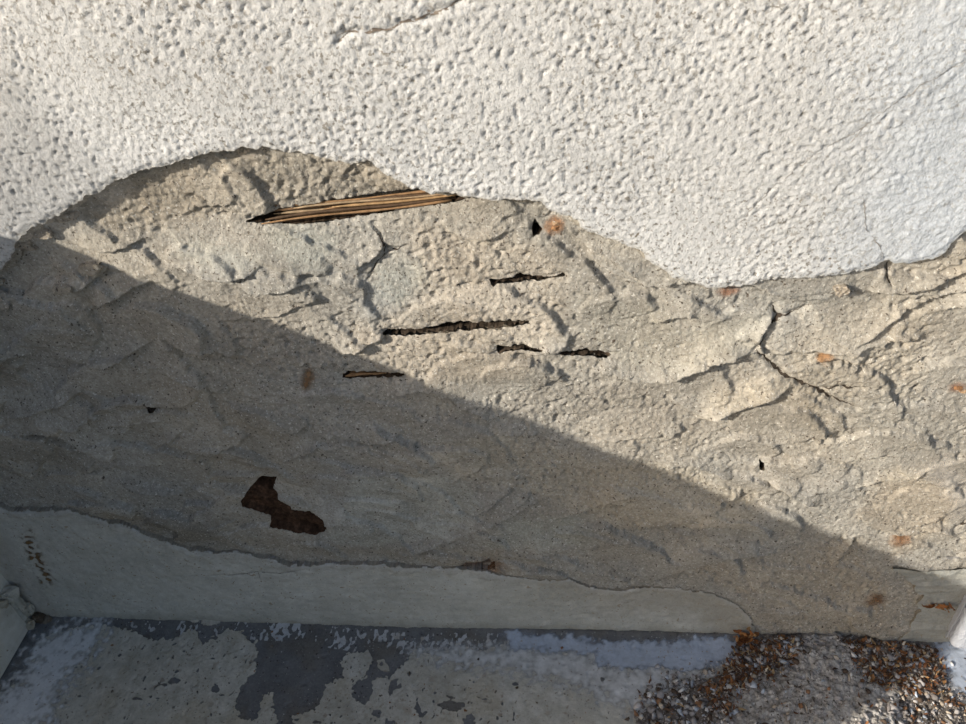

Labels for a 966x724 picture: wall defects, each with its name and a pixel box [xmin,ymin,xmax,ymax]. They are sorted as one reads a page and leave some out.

flaking render [0,146,966,724]
crack [756,304,857,406]